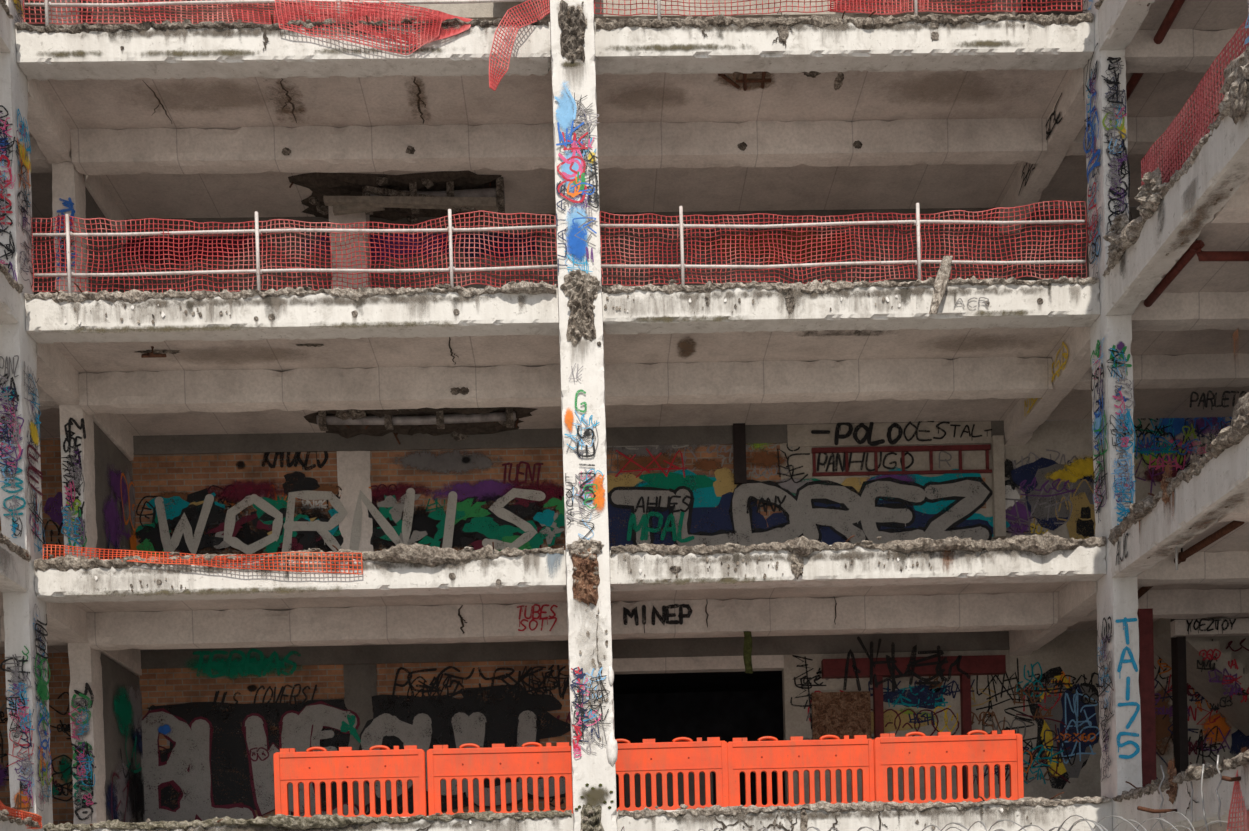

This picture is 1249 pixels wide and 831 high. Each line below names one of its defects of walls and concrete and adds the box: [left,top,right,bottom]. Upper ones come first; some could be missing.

crack [261,28,269,51]
spalling [0,0,1104,63]
crack [280,78,297,123]
crack [413,77,426,124]
spalling [0,46,1249,346]
spalling [0,387,1249,741]
spalling [0,749,1249,831]